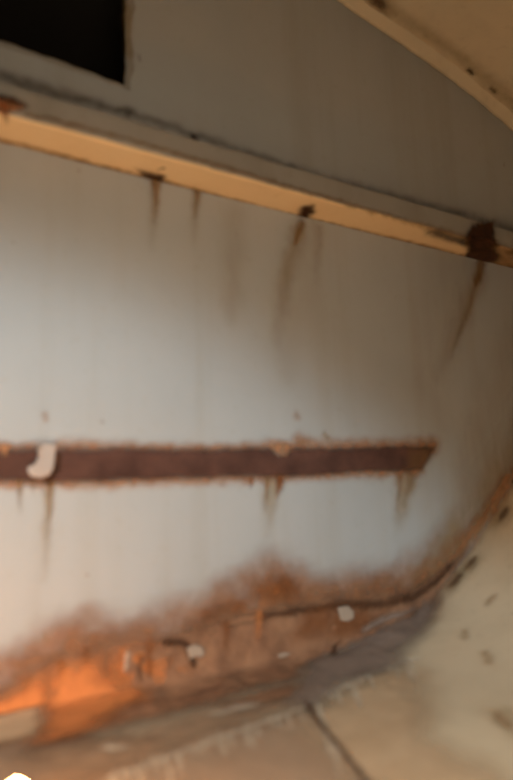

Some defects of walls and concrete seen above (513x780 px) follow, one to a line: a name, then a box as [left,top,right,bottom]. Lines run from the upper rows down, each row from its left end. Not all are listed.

corrosion [0,95,25,118]
corrosion [0,140,221,198]
corrosion [295,206,315,244]
corrosion [452,221,513,285]
corrosion [0,439,436,492]
peeling [337,606,354,622]
peeling [187,644,204,659]